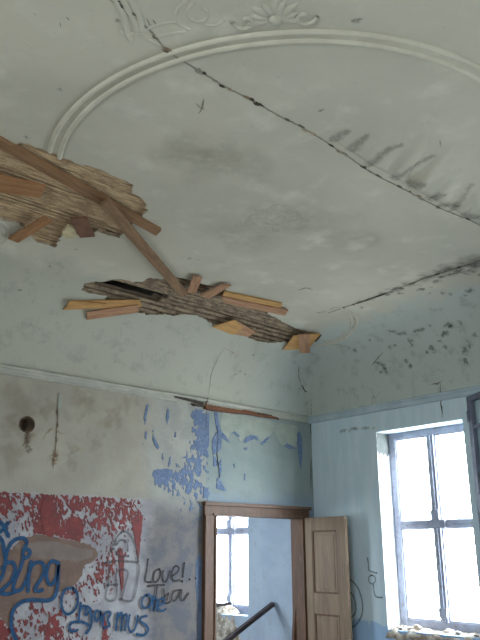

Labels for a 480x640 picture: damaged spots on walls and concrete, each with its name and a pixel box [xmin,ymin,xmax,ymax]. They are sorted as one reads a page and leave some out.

crack [110,0,480,226]
flaking render [31,224,78,248]
spalling [139,311,217,325]
crack [330,260,480,313]
peeling [145,396,302,529]
peeling [0,491,145,640]